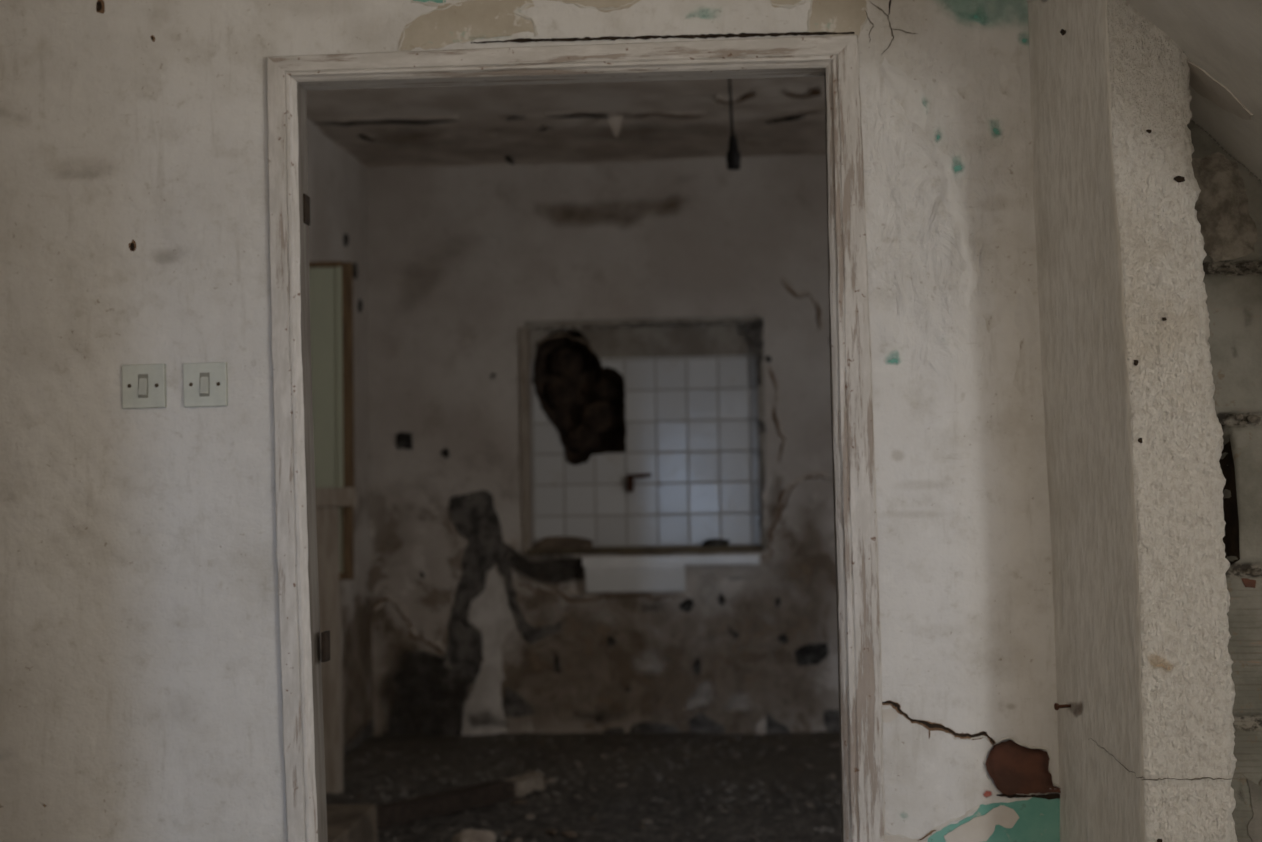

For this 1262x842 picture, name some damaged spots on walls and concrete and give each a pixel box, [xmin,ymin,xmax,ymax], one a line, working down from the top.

peeling [398,0,538,51]
peeling [553,0,641,12]
crack [472,0,918,55]
peeling [770,0,868,37]
spalling [1174,152,1258,263]
spalling [533,331,627,465]
leakage [344,603,468,744]
spalling [386,490,694,736]
leakage [514,523,819,721]
crack [882,700,996,745]
peeling [885,737,1061,842]